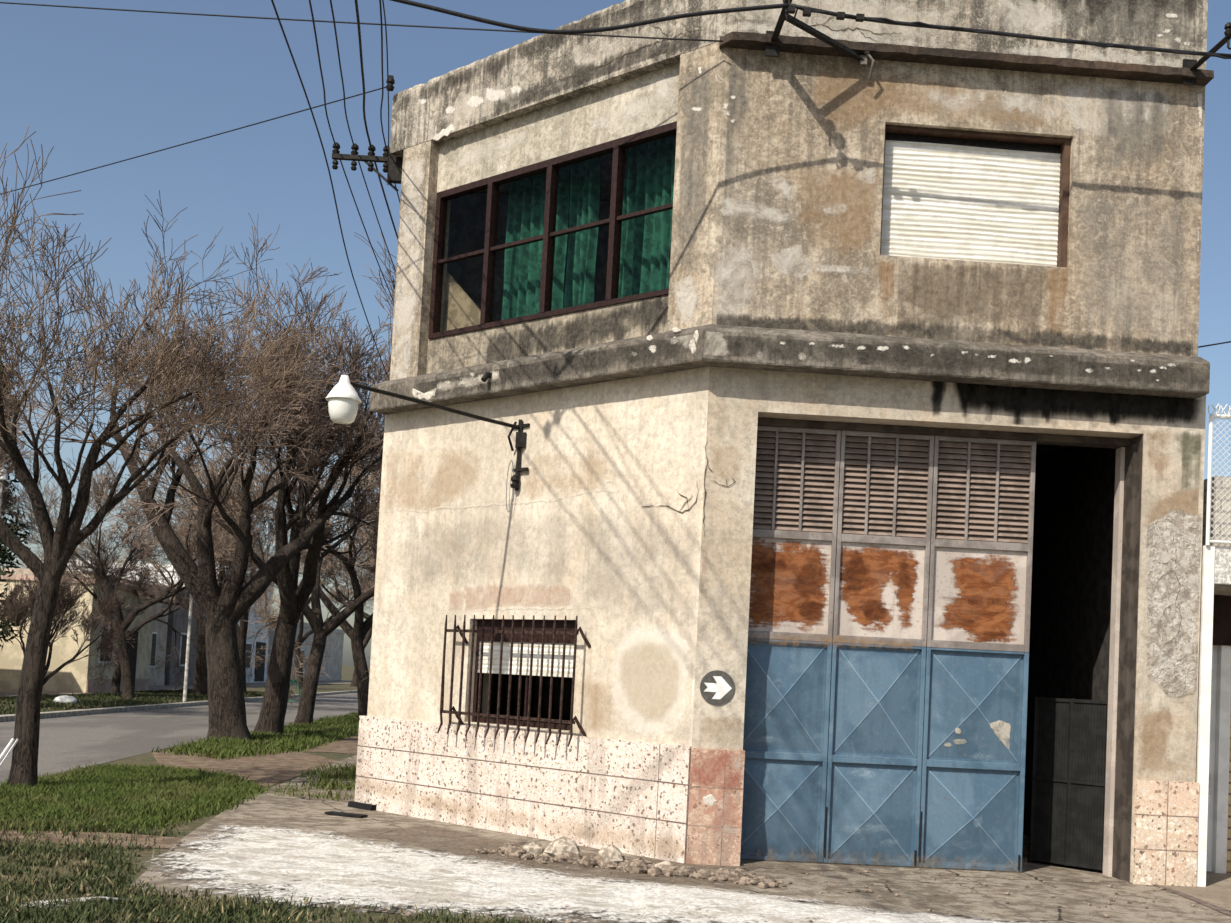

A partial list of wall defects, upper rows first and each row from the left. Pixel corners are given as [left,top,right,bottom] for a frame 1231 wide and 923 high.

leakage [402,68,472,107]
leakage [487,52,510,81]
leakage [530,0,656,51]
leakage [494,35,700,116]
leakage [741,23,772,33]
leakage [1013,47,1068,58]
leakage [1004,0,1194,34]
leakage [722,199,787,221]
leakage [708,247,1201,487]
corrosion [749,537,919,631]
corrosion [940,555,1018,642]
peeling [1140,509,1201,697]